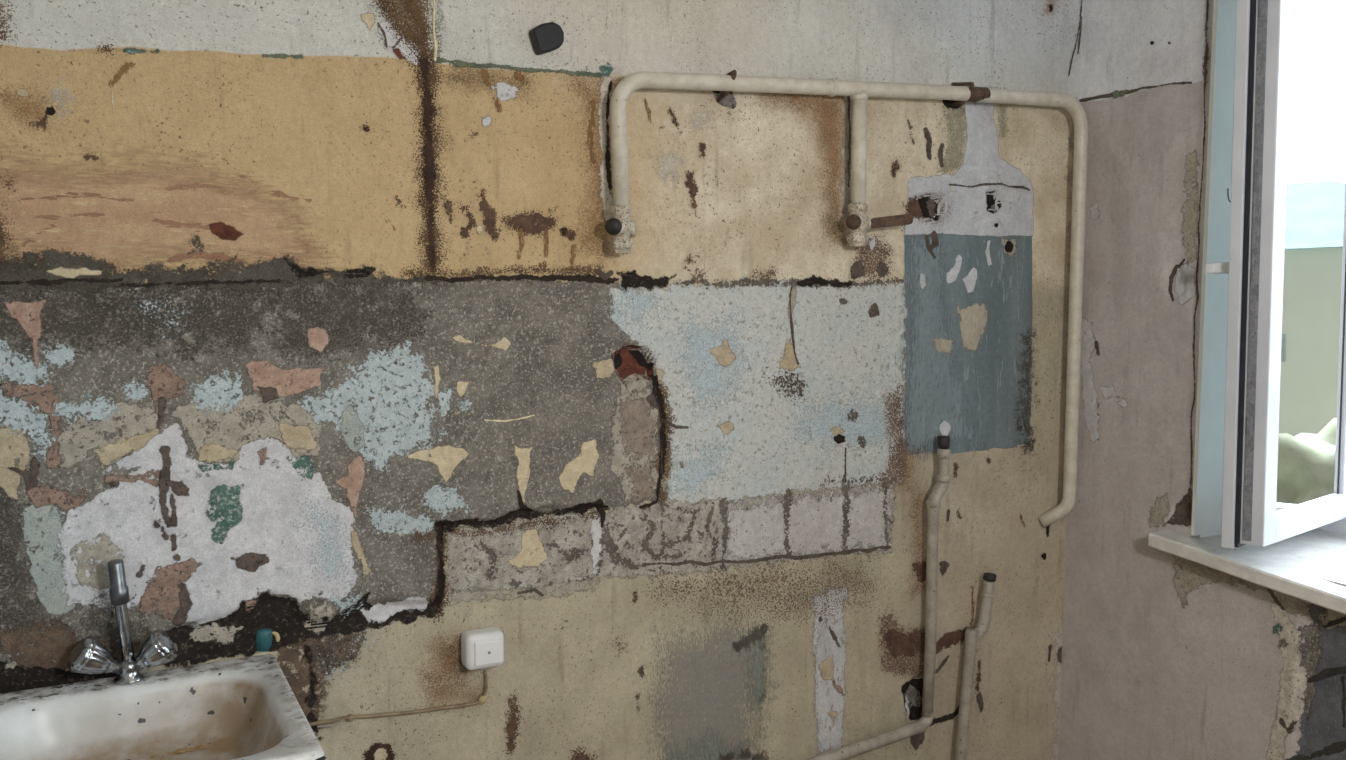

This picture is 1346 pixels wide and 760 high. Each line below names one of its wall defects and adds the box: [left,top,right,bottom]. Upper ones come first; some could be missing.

peeling [209,222,243,240]
leakage [0,0,454,298]
leakage [760,93,845,241]
peeling [907,100,962,167]
peeling [932,240,992,354]
crack [1068,0,1209,486]
peeling [0,232,926,756]
crack [408,375,689,625]
peeling [939,420,951,436]
spalling [1147,481,1193,527]
spalling [1266,588,1346,760]